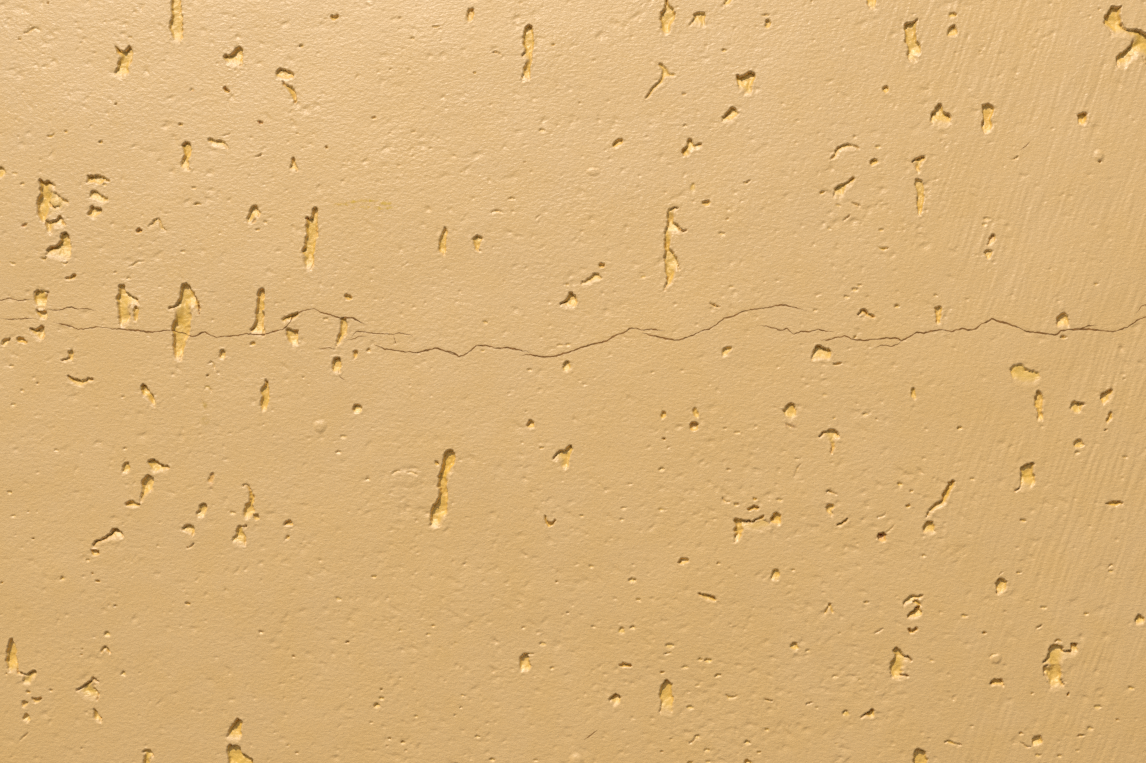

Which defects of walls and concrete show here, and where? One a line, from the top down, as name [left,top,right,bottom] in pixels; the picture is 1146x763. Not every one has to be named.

spalling [167,0,185,47]
spalling [518,23,537,85]
hole [1100,3,1146,72]
spalling [34,176,78,283]
spalling [298,205,321,273]
hole [660,205,689,294]
hole [165,281,202,365]
crack [0,298,1146,358]
hole [428,447,457,532]